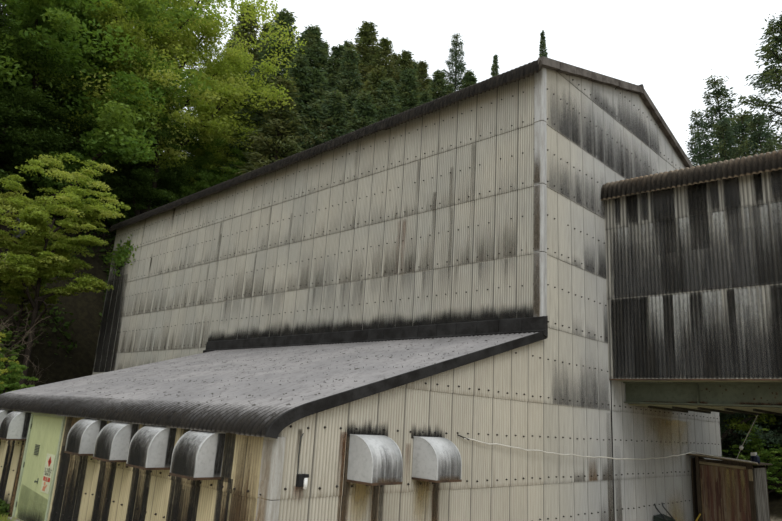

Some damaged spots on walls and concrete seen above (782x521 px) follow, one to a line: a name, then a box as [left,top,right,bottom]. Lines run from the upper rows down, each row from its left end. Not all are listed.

leakage [551,113,638,179]
leakage [594,95,659,153]
leakage [615,169,782,251]
leakage [208,194,539,342]
leakage [585,249,782,377]
leakage [0,410,31,517]
leakage [50,421,117,521]
leakage [125,424,151,521]
leakage [165,428,200,521]